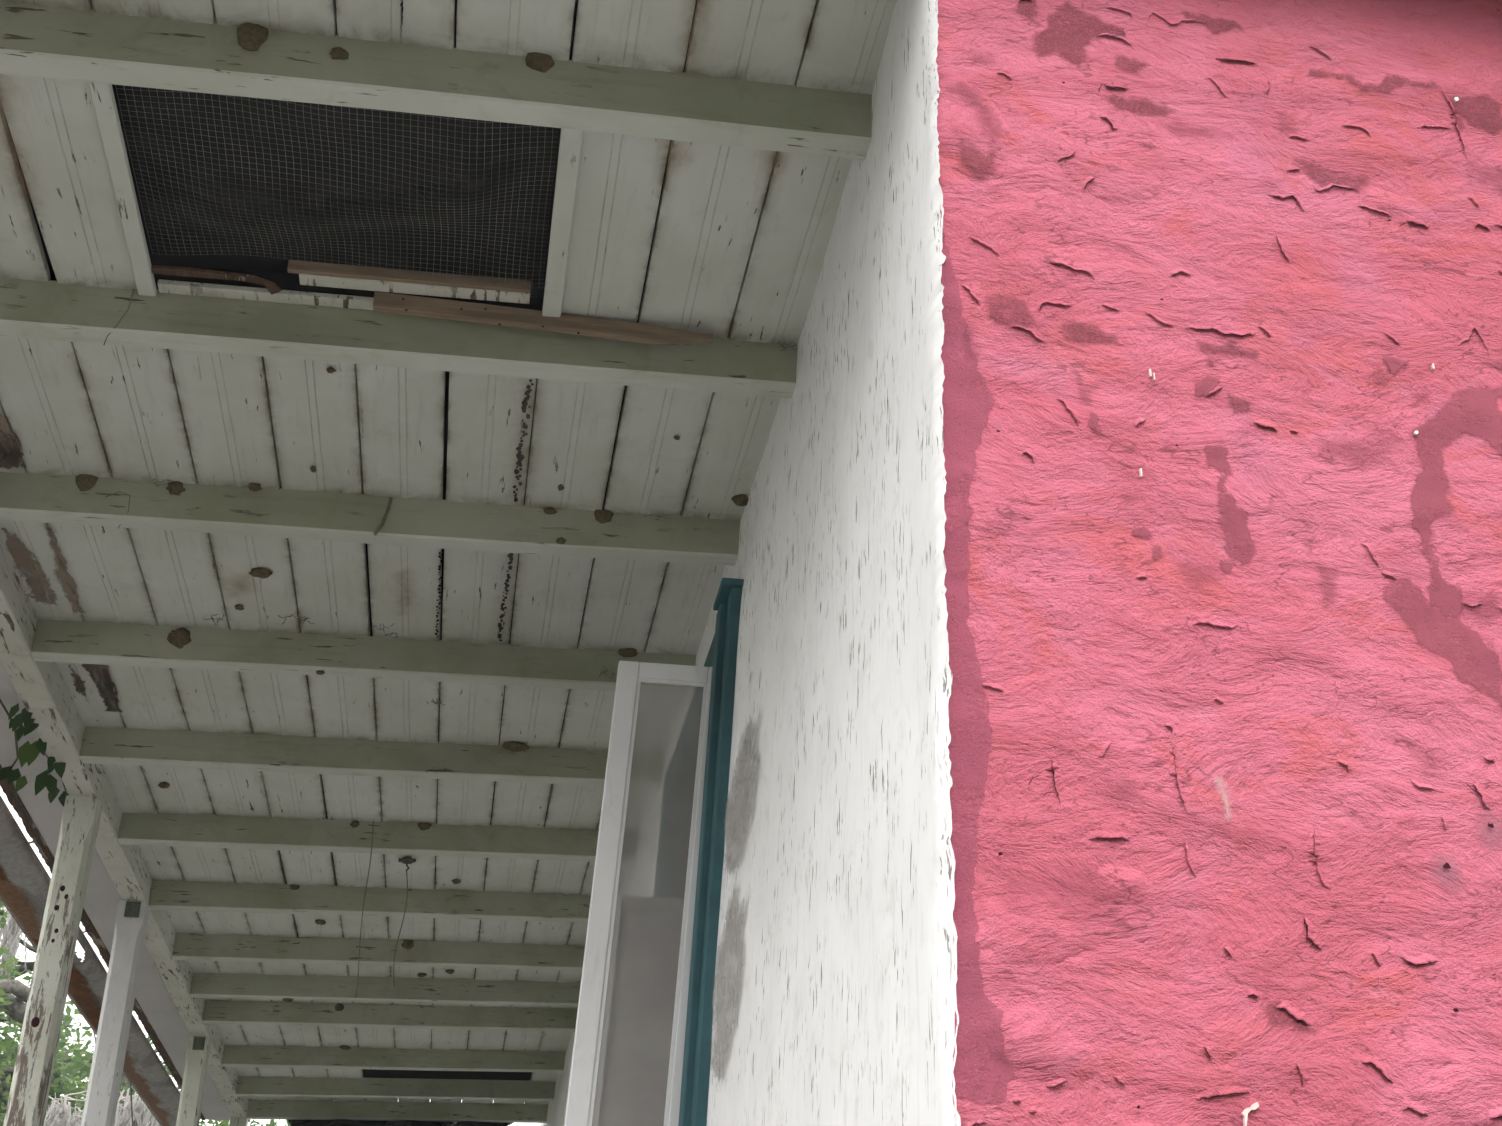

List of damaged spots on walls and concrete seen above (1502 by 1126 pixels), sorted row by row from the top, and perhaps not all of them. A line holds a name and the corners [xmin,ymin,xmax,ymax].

spalling [1017,0,1124,64]
spalling [1116,56,1145,73]
spalling [1310,70,1436,93]
spalling [1450,94,1502,134]
peeling [0,414,26,469]